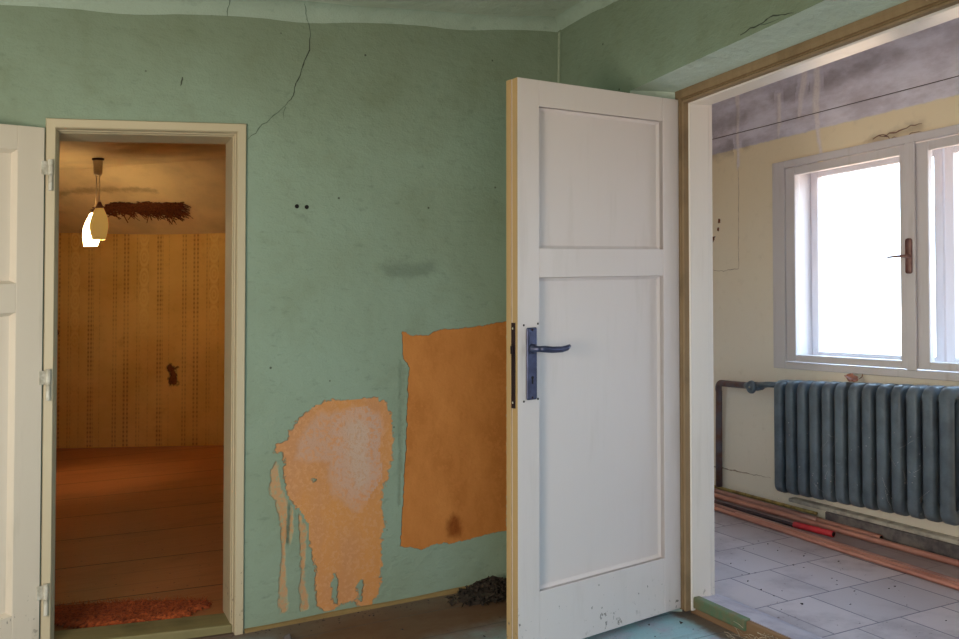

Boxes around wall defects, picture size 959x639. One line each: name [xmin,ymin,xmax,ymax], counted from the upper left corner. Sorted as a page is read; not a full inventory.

crack [247,4,311,140]
water stain [774,66,827,162]
peeling [266,318,507,616]